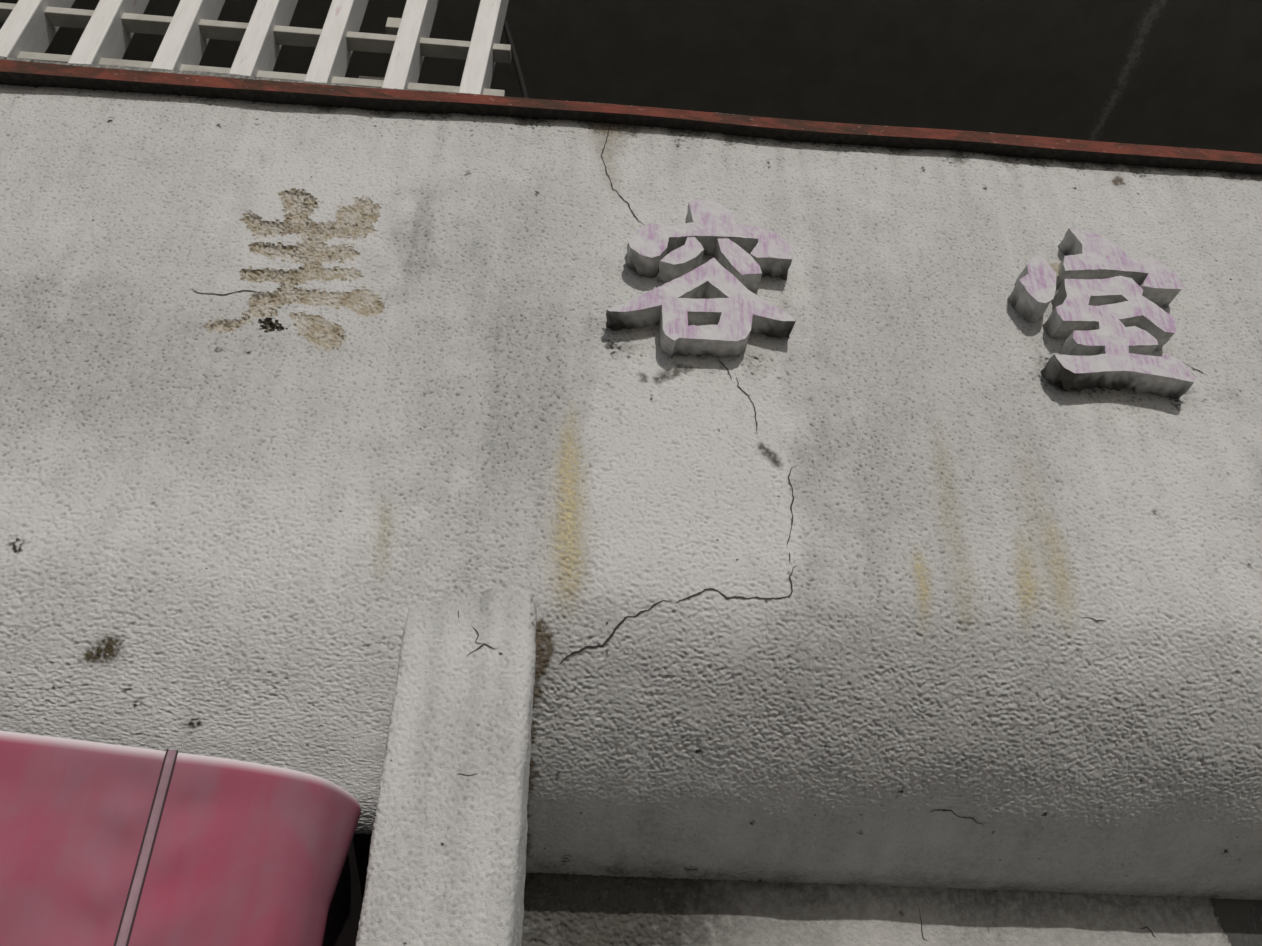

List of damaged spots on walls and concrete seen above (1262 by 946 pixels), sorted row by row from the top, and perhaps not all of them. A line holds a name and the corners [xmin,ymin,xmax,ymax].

crack [601,123,643,224]
crack [560,360,797,664]